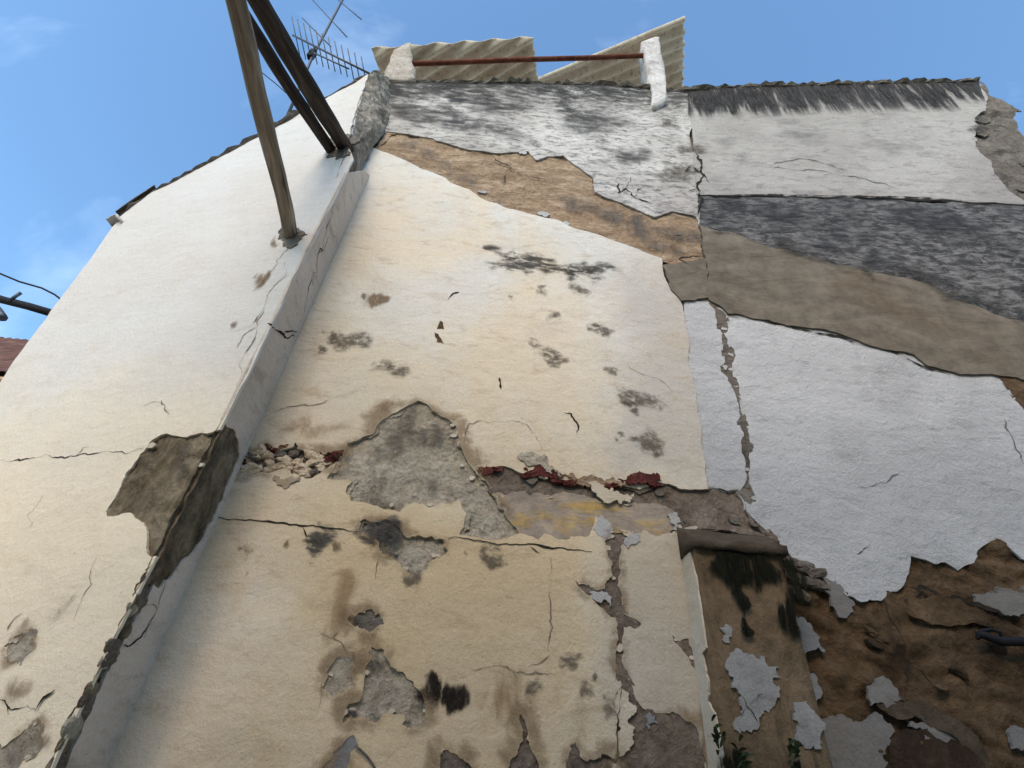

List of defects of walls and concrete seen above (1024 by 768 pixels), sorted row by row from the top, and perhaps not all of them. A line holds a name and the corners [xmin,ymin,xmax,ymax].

water stain [389,82,652,133]
water stain [658,81,985,126]
water stain [658,146,704,180]
spalling [375,132,703,264]
water stain [483,245,615,293]
crack [234,195,335,397]
crack [13,447,142,461]
crack [219,517,356,537]
spalling [0,399,780,768]
spalling [782,538,1024,768]
crack [615,690,623,750]